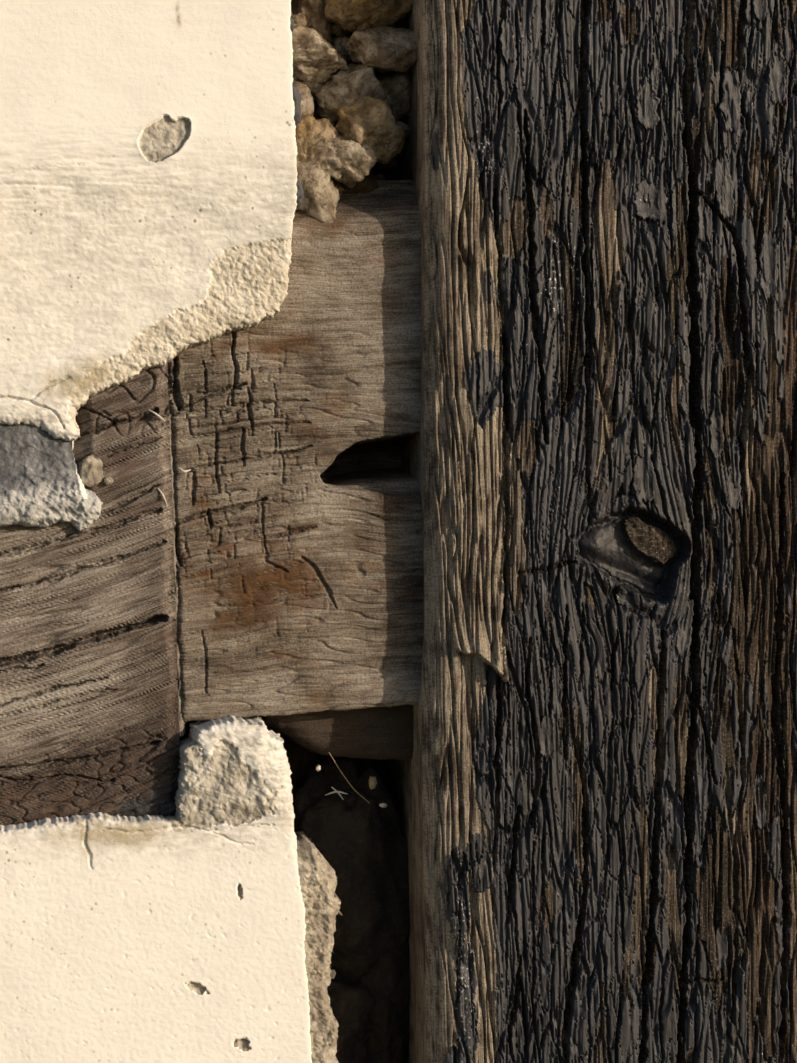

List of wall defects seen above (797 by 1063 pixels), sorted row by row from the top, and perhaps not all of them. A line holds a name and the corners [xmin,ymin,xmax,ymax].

peeling [139,115,191,163]
peeling [431,133,440,172]
spalling [0,238,292,531]
crack [0,331,338,609]
peeling [443,0,797,1063]
crack [0,615,168,718]
crack [0,741,162,784]
spalling [163,735,277,832]